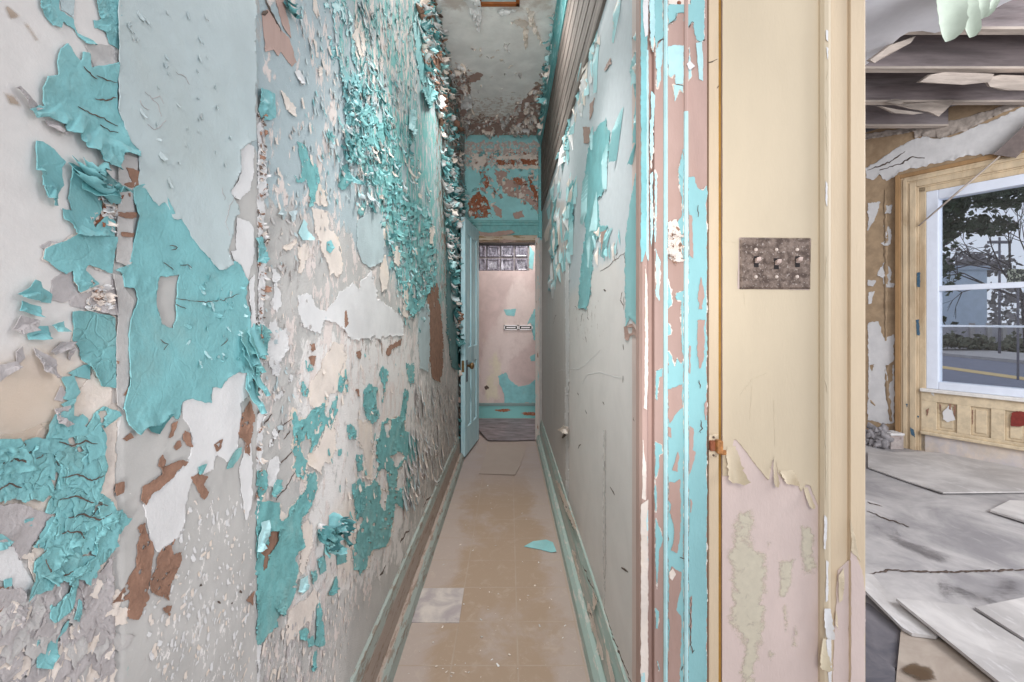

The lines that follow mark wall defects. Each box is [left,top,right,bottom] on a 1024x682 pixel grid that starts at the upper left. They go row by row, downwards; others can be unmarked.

peeling [0,0,708,682]